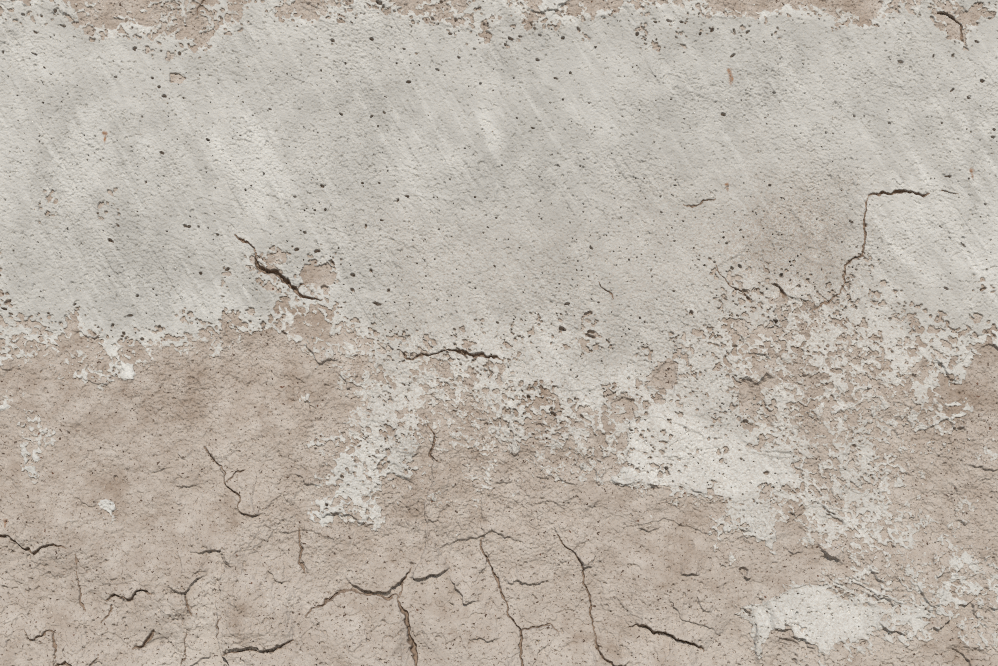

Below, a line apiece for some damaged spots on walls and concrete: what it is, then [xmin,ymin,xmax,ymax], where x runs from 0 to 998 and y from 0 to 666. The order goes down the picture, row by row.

peeling [0,0,996,51]
crack [234,234,323,301]
crack [812,190,959,311]
crack [403,349,504,361]
crack [204,446,259,517]
peeling [0,245,998,666]
crack [24,630,99,666]
crack [0,535,152,622]
crack [305,569,418,666]
crack [480,538,559,666]
crack [557,534,622,666]
crack [628,624,704,652]